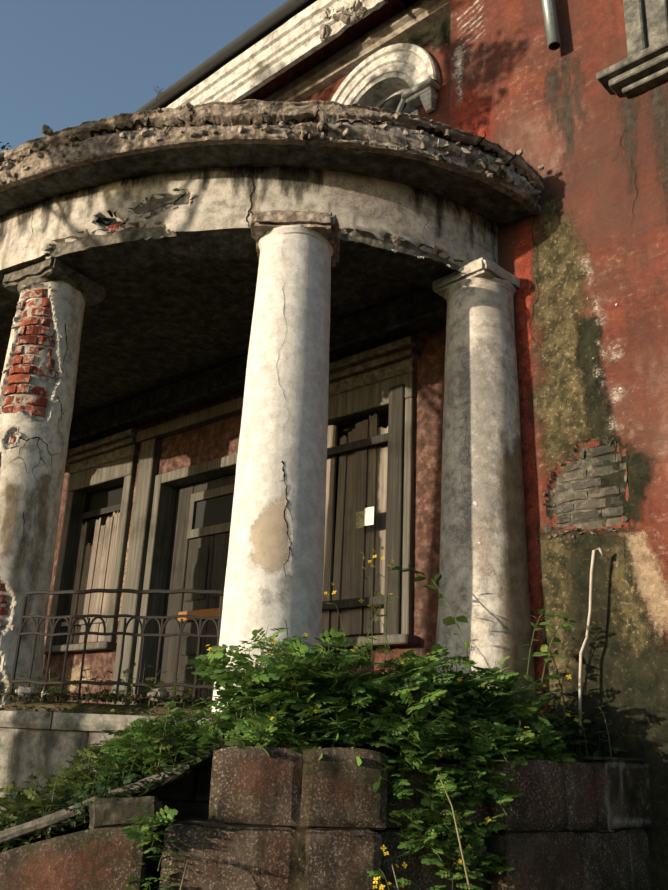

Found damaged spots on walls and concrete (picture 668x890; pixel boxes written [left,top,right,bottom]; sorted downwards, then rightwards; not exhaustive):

spalling [320,112,471,169]
water stain [42,198,50,229]
water stain [65,192,73,218]
spalling [41,187,196,260]
water stain [233,167,267,208]
water stain [279,167,405,224]
spalling [0,284,65,422]
spalling [1,425,22,449]
crack [0,323,71,479]
crack [281,461,293,576]
spalling [542,418,668,637]
water stain [499,316,668,890]